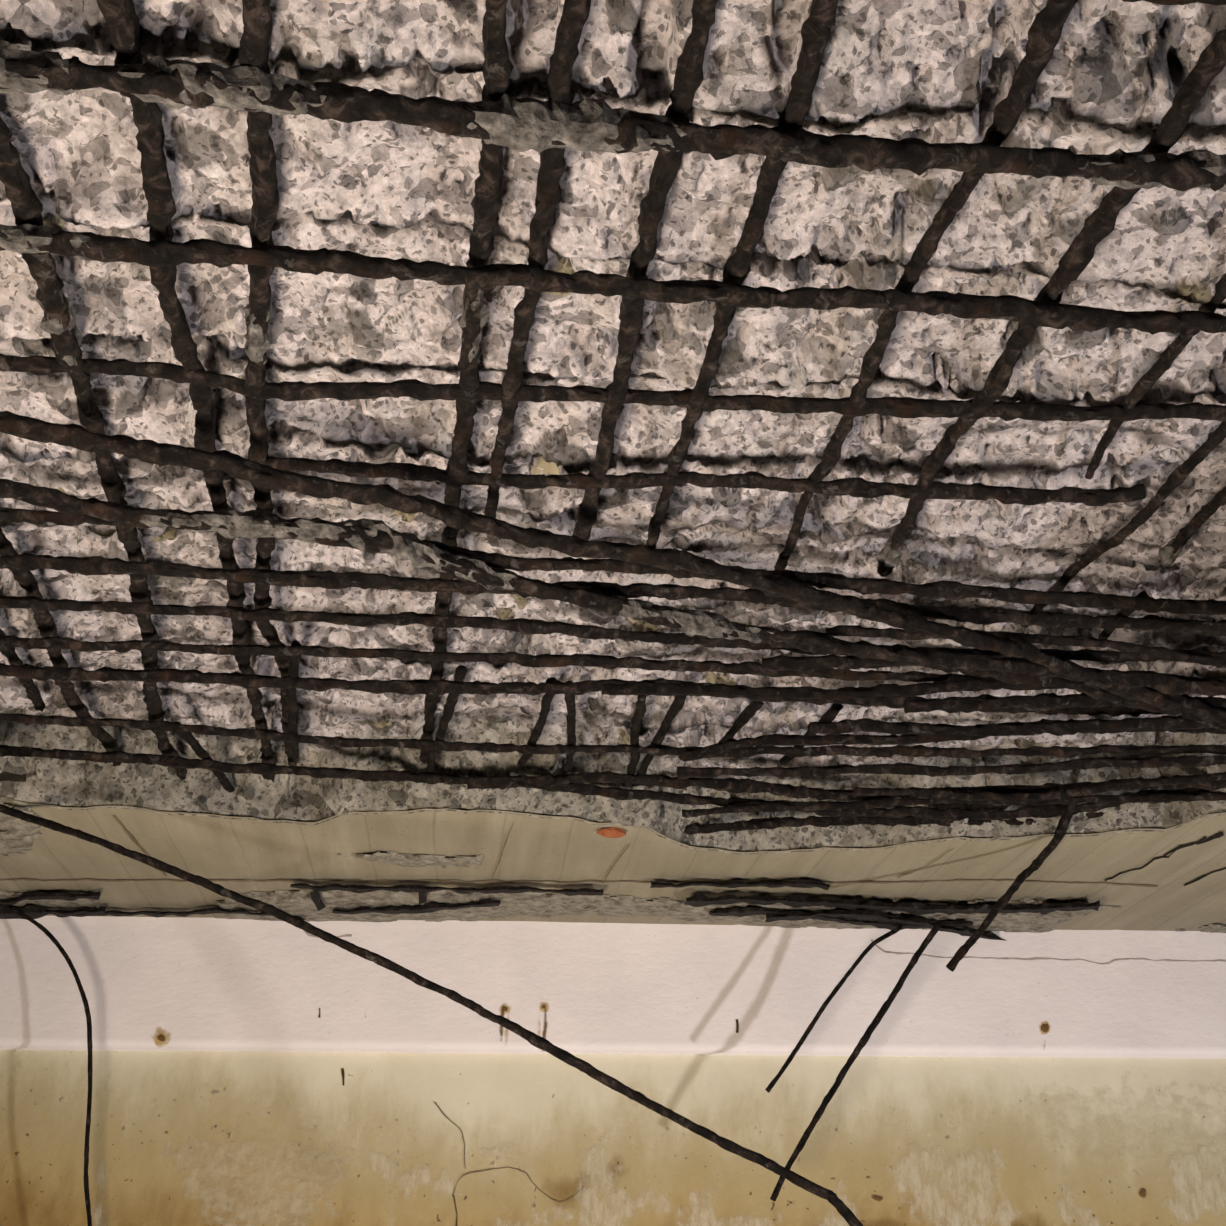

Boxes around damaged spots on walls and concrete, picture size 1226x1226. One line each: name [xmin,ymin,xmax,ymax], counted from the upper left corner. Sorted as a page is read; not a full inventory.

spalling [0,0,1226,732]
corrosion [597,827,626,838]
spalling [0,507,1226,1226]
corrosion [540,1003,548,1051]
crack [434,1102,584,1226]
leakage [0,1082,1226,1226]